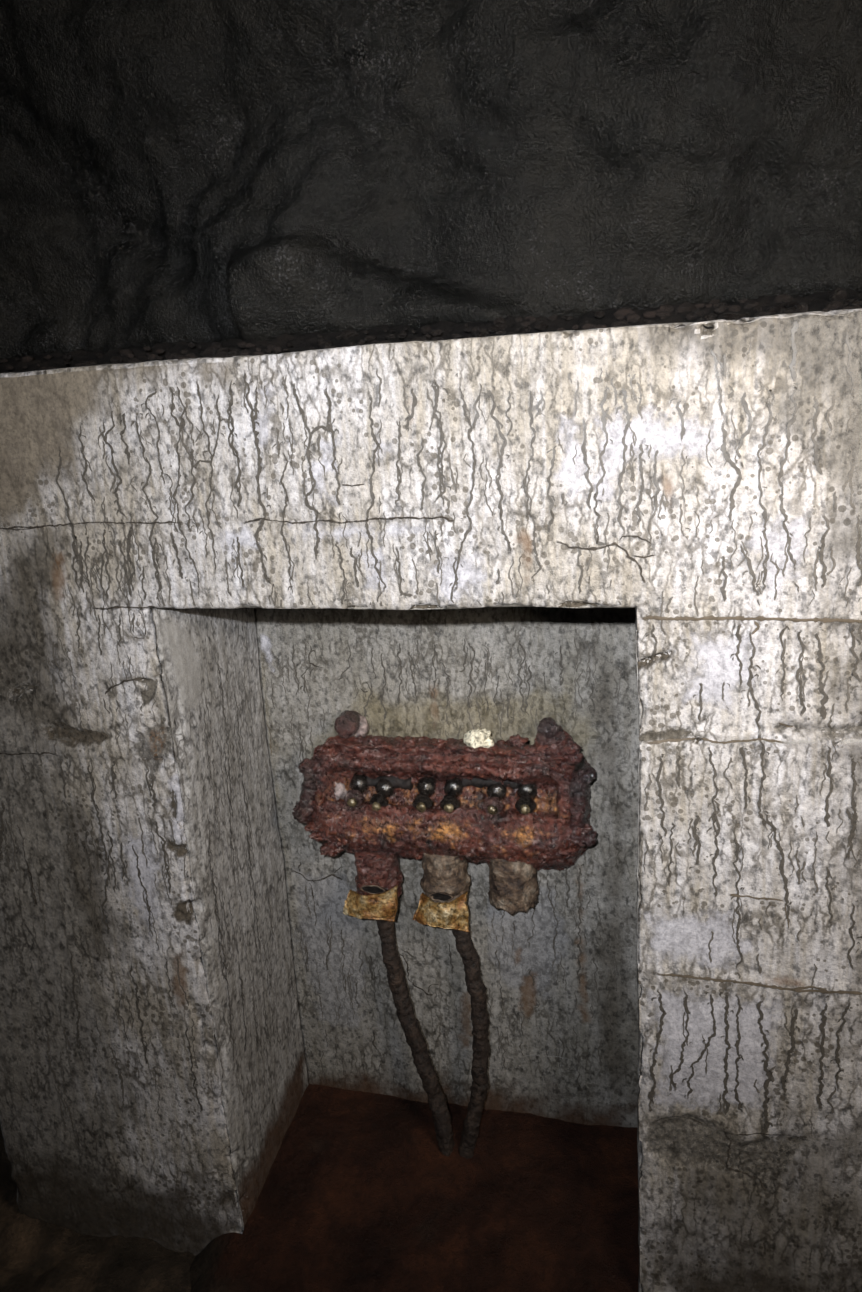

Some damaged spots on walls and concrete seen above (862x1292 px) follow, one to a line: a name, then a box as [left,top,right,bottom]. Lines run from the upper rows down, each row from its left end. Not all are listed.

crack [0,521,179,530]
crack [246,516,462,524]
crack [557,525,654,583]
crack [94,606,155,639]
crack [643,615,862,634]
crack [103,678,148,713]
crack [647,723,793,744]
water stain [0,311,862,1228]
crack [294,862,342,898]
crack [730,894,789,927]
crack [657,973,862,995]
water stain [705,1149,809,1292]